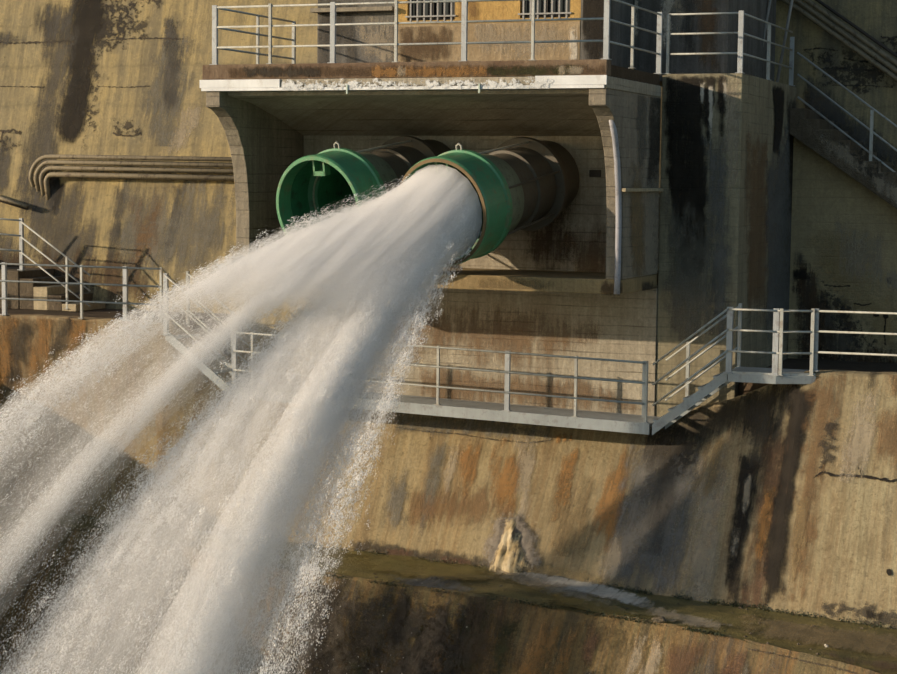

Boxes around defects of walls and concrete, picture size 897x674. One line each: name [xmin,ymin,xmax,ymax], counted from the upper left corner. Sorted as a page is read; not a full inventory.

damp [0,0,235,301]
damp [631,76,740,339]
damp [5,321,35,391]
damp [498,384,814,627]
crack [814,467,897,482]